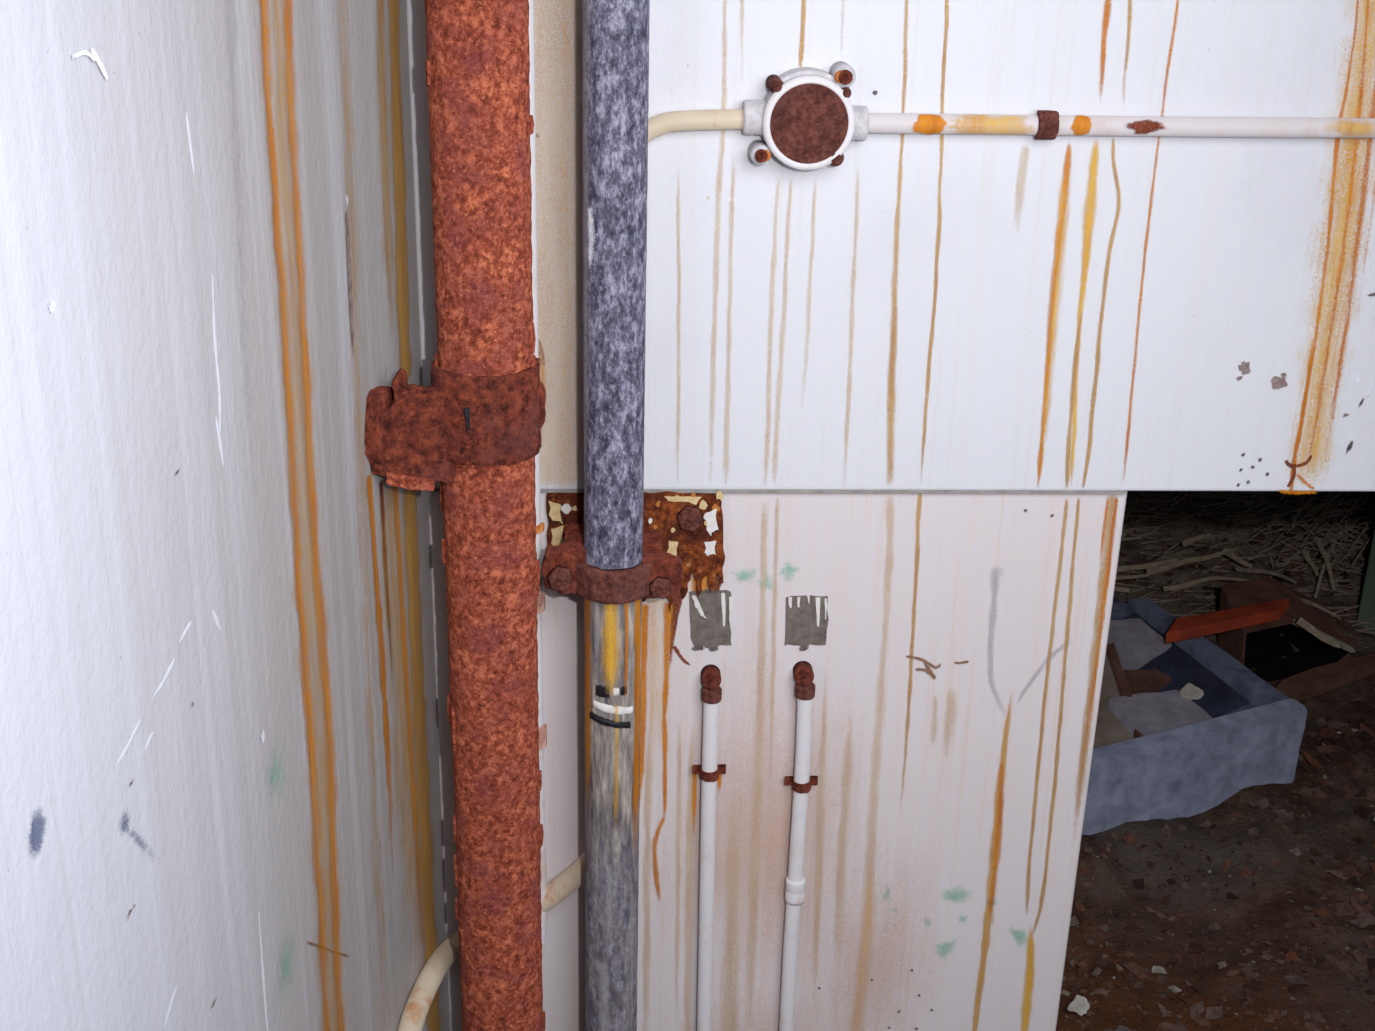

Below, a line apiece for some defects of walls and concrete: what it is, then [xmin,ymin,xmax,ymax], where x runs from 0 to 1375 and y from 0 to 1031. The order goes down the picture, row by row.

corrosion [1014,146,1031,229]
corrosion [1099,0,1133,102]
corrosion [1122,137,1160,479]
corrosion [1161,0,1179,117]
corrosion [1279,0,1375,495]
corrosion [257,0,350,1031]
corrosion [1020,115,1121,1031]
corrosion [584,568,723,1031]
corrosion [972,693,1012,1031]